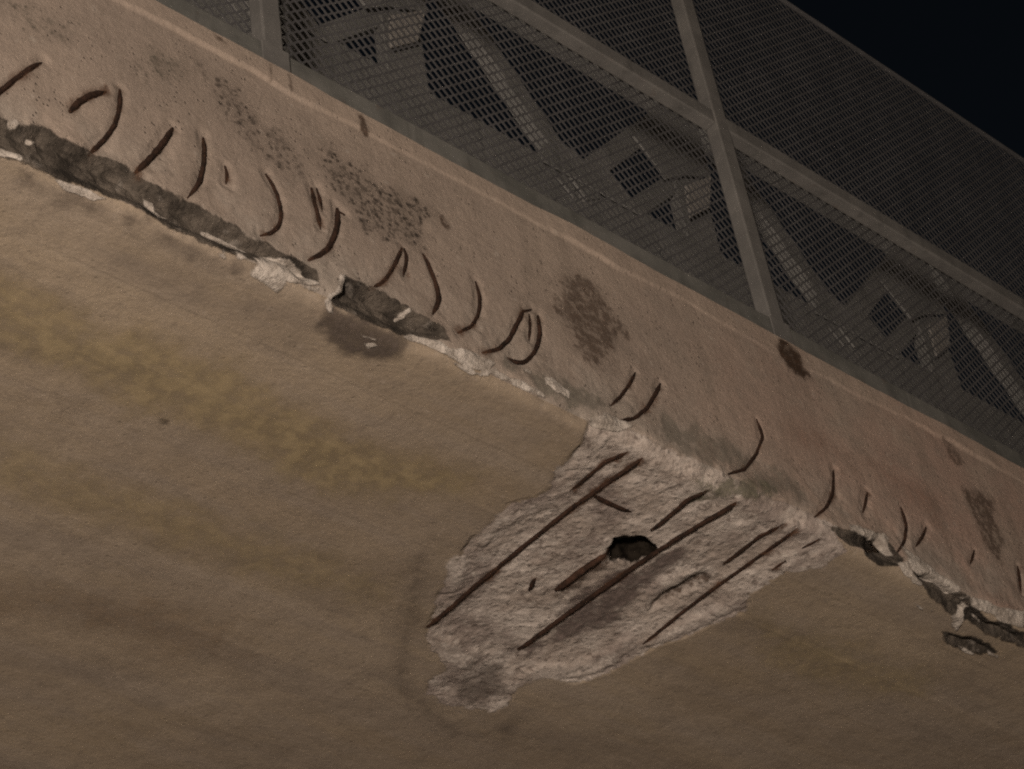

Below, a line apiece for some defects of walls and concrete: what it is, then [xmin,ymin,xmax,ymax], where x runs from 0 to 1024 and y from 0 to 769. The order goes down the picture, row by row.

spalling [0,87,570,410]
water stain [554,274,627,363]
spalling [426,372,1024,712]